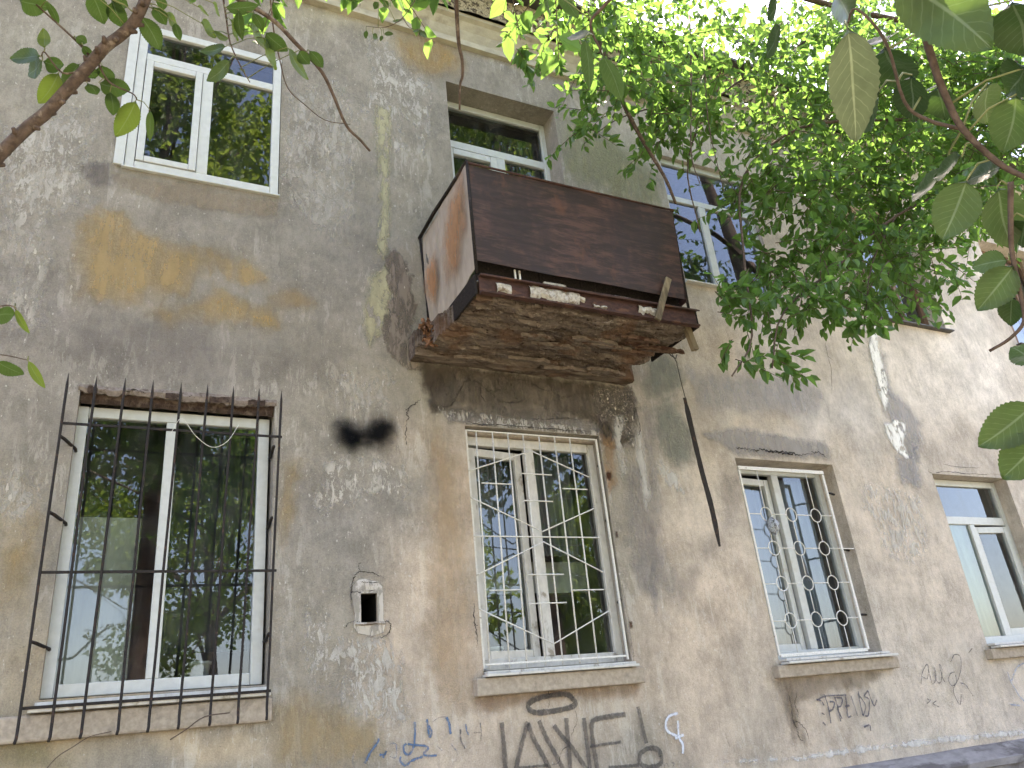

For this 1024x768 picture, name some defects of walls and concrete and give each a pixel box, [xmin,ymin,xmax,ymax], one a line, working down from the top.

corrosion [426,183,464,298]
crack [405,373,591,445]
water stain [420,363,649,502]
flaking render [438,332,685,448]
crack [737,447,827,458]
peeling [869,326,888,410]
peeling [885,420,909,458]
crack [344,563,391,638]